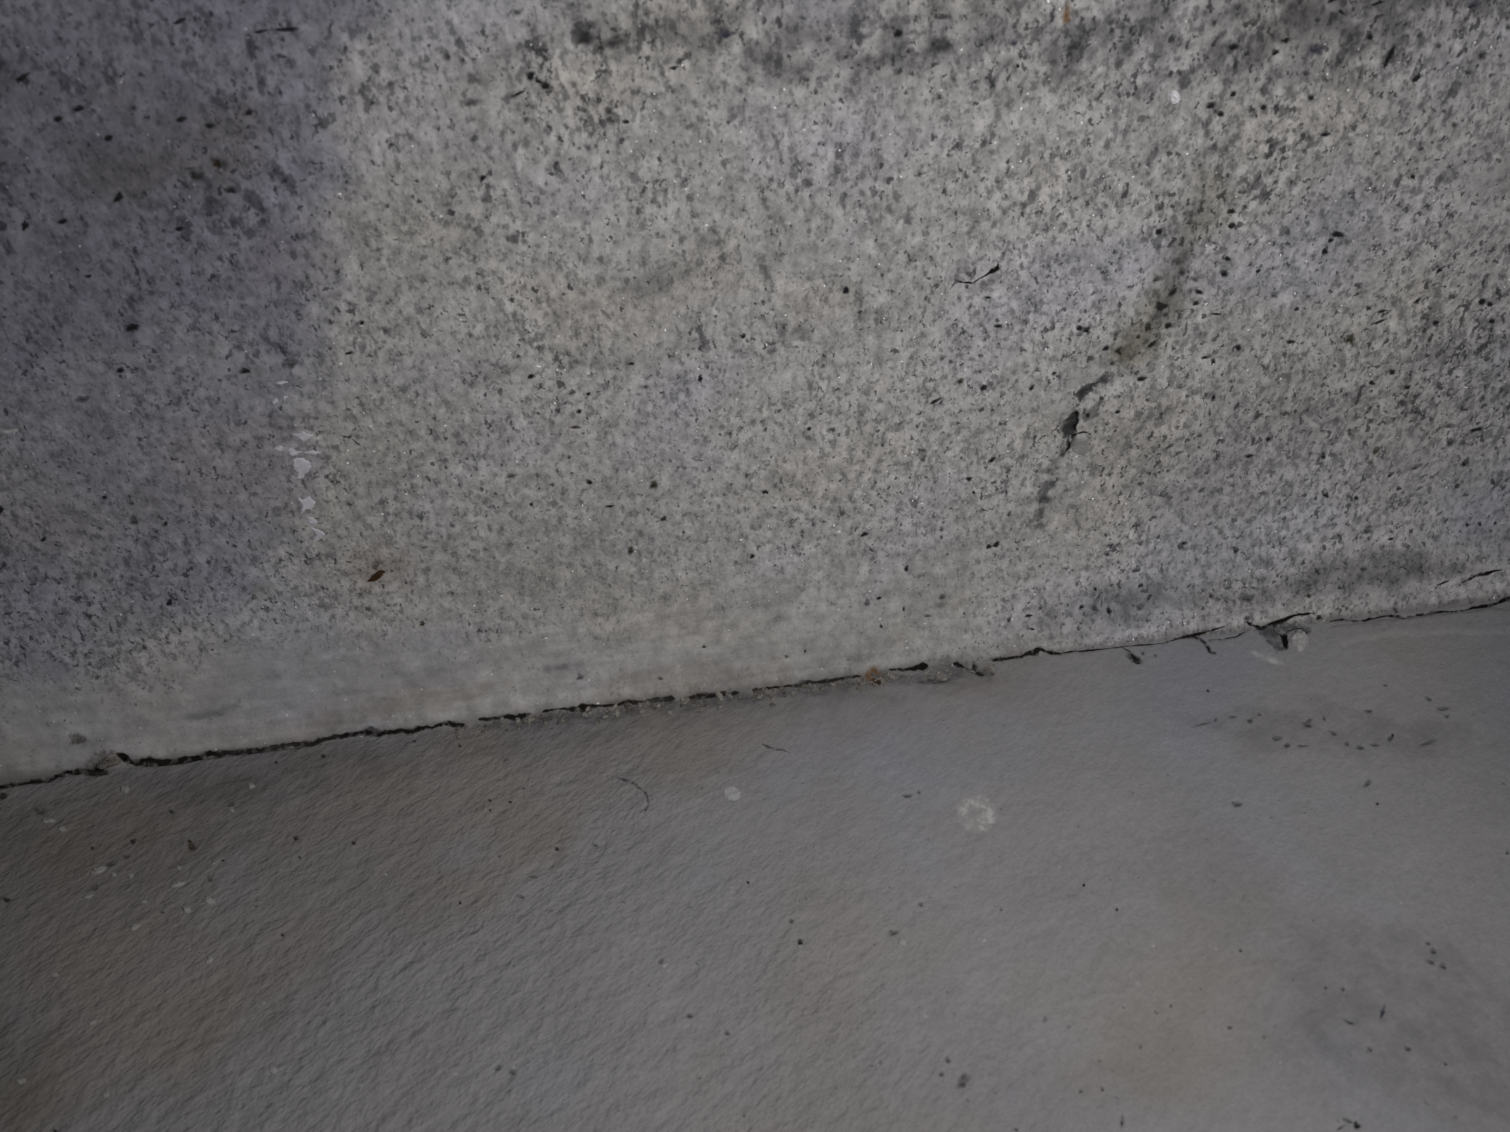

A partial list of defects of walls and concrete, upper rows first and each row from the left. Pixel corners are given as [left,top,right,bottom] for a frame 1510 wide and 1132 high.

crack [0,569,1510,789]